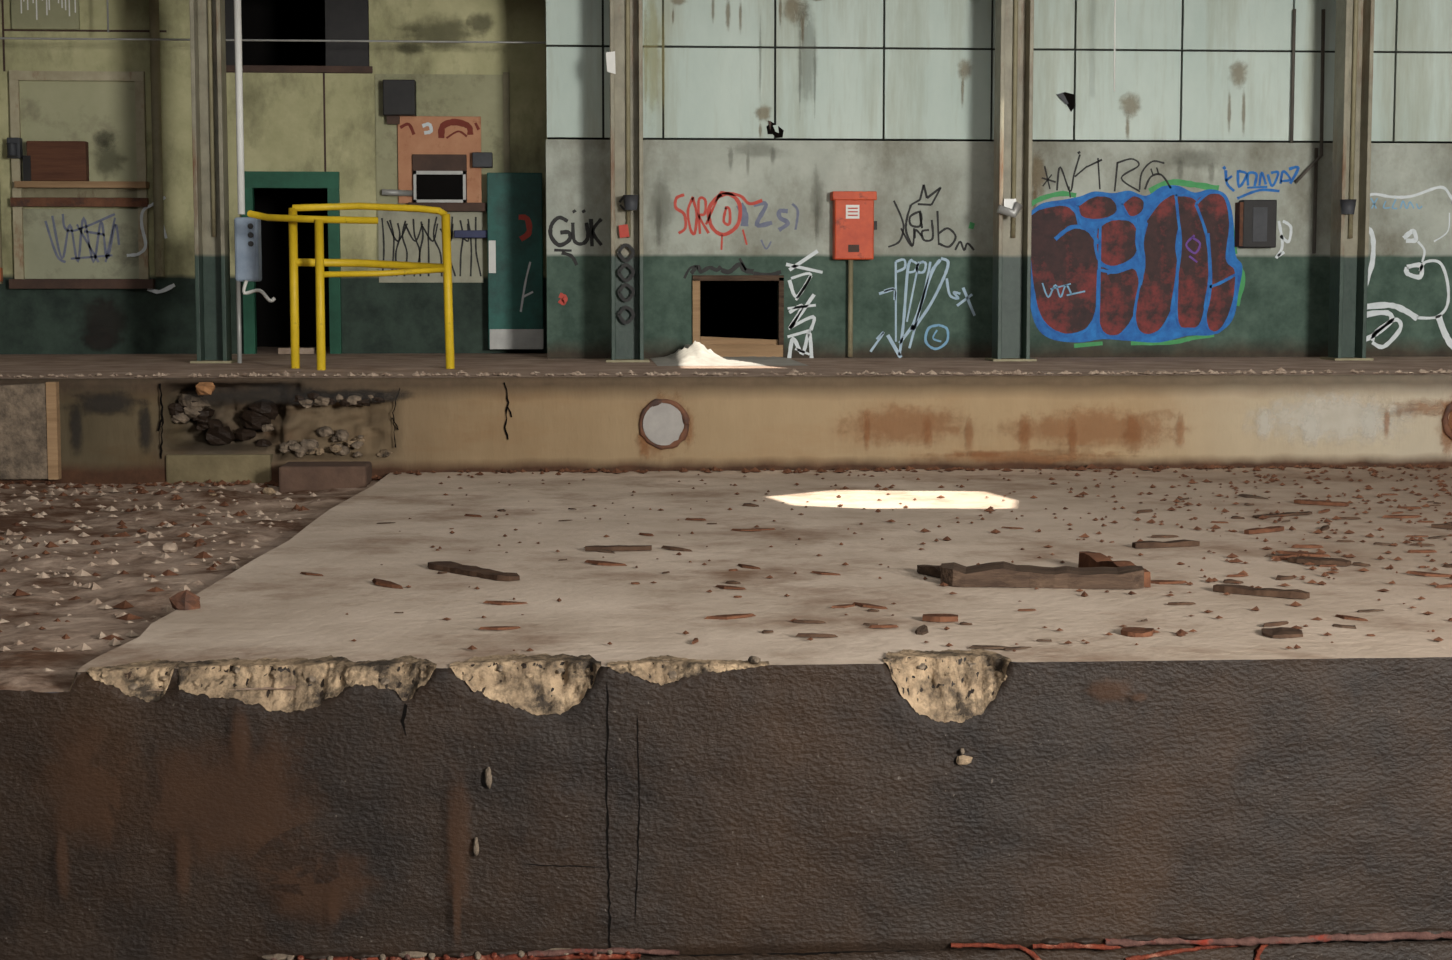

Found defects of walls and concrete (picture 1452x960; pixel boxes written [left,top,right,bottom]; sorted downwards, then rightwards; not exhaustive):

spalling [168,382,393,458]
crack [400,694,408,735]
spalling [86,653,770,715]
spalling [882,649,1011,723]
spalling [956,748,972,765]
crack [528,680,640,960]
crack [657,948,1004,957]
crack [1299,938,1452,946]